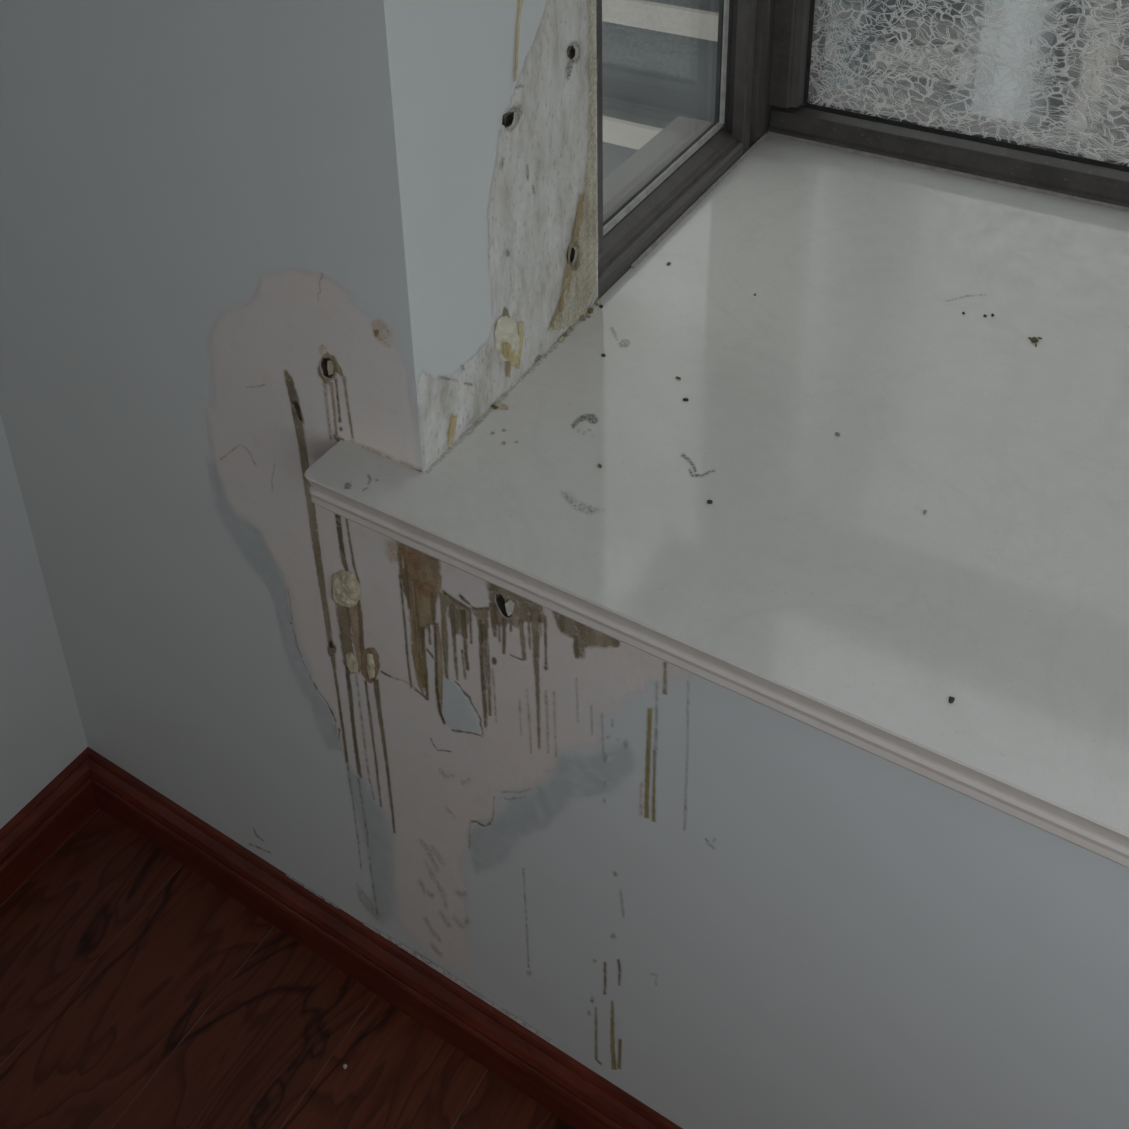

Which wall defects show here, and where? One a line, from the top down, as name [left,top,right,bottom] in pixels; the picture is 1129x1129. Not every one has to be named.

peeling [203,0,695,972]
damp [398,542,491,727]
damp [553,611,619,657]